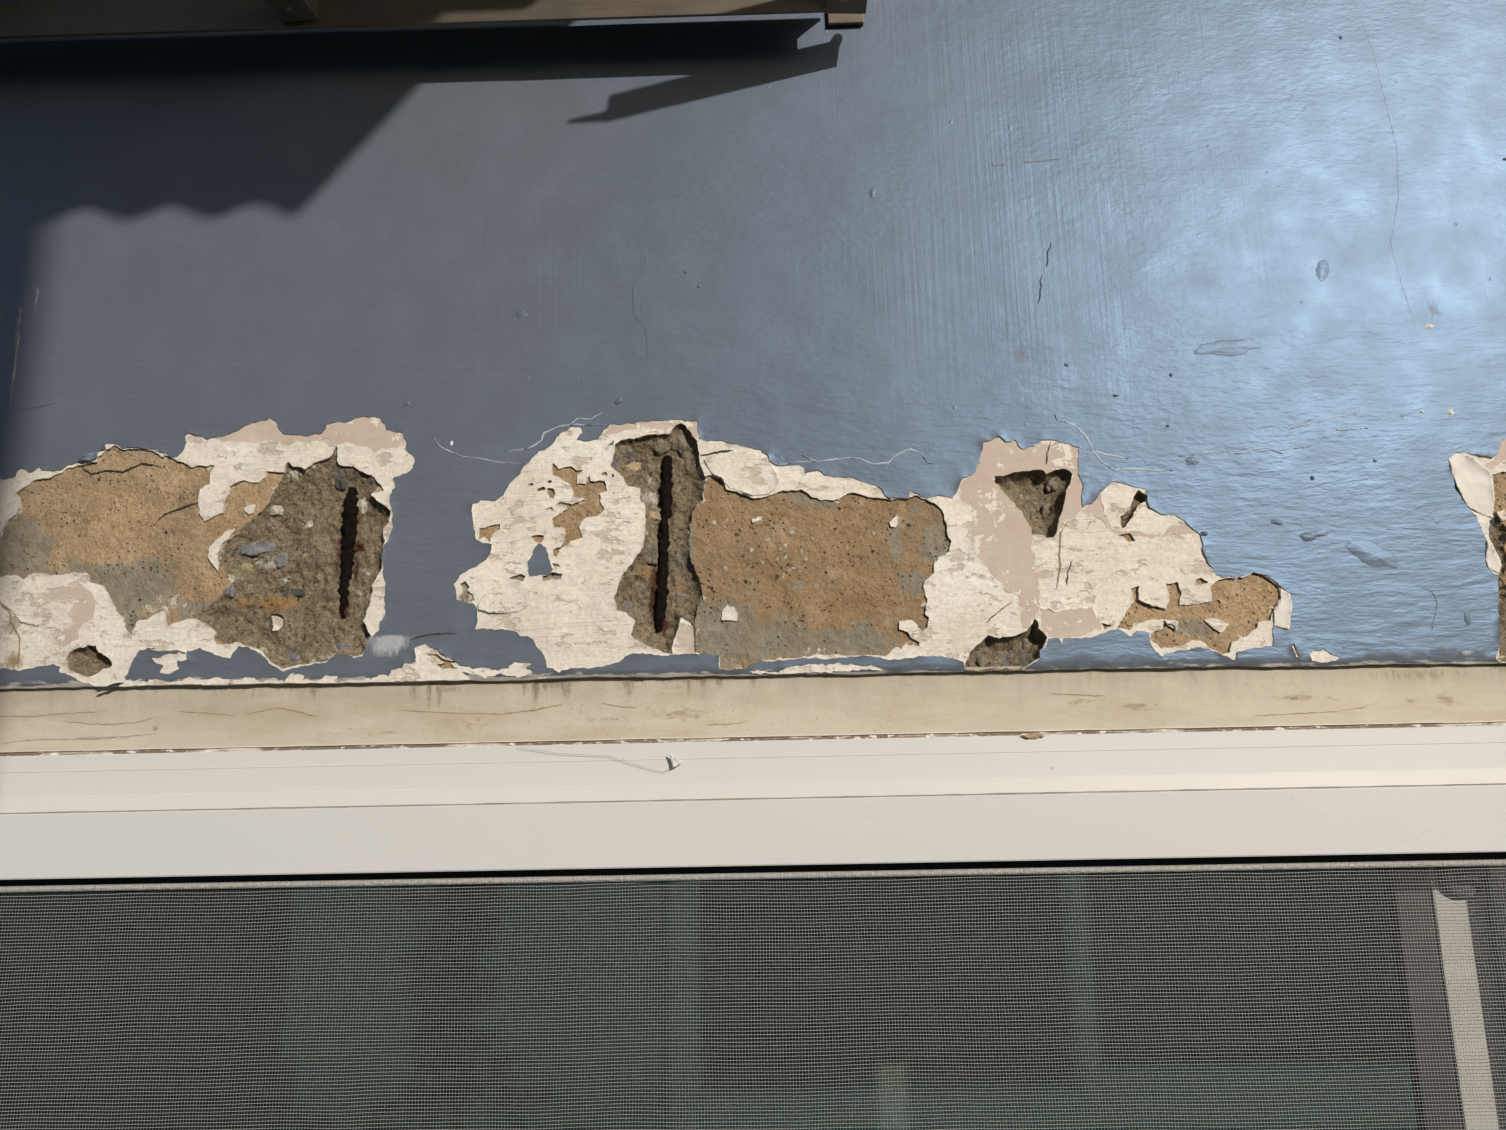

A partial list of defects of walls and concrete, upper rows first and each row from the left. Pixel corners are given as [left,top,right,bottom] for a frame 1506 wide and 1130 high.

peeling [0,416,1340,687]